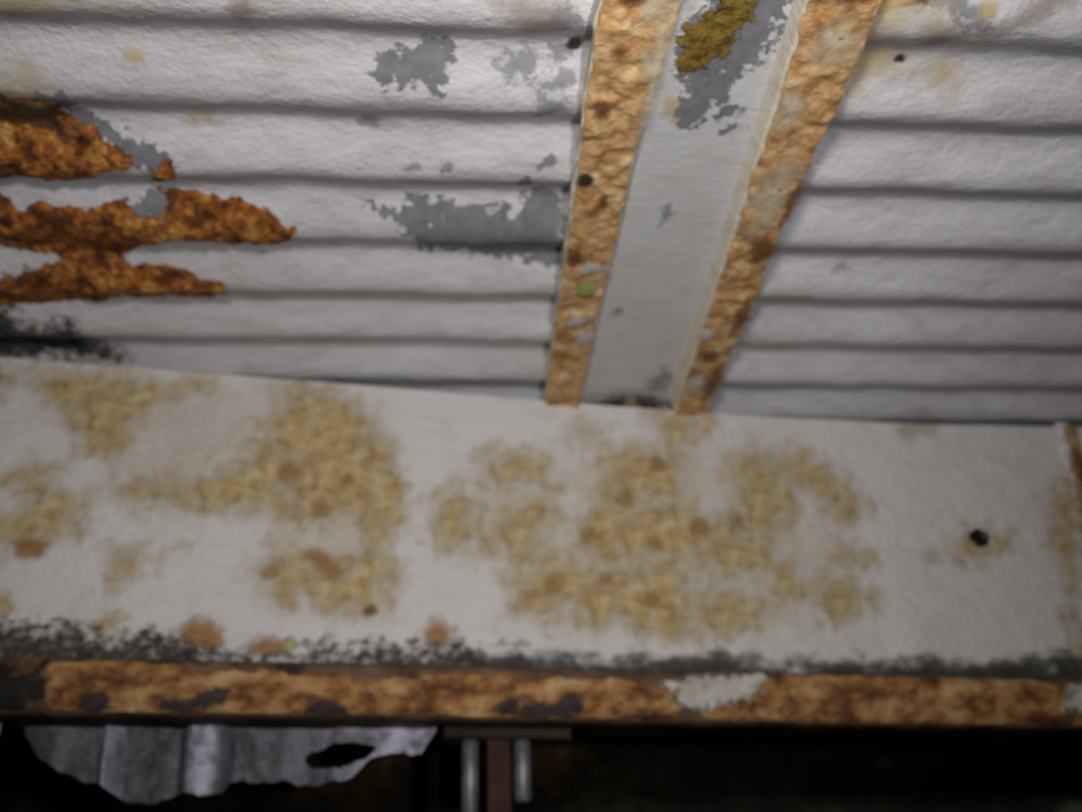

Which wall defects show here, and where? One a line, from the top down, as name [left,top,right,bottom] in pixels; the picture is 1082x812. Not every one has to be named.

peeling [368,36,458,98]
peeling [495,47,536,78]
peeling [537,43,576,117]
corrosion [0,90,298,307]
peeling [361,154,568,267]
corrosion [546,0,924,416]
corrosion [1051,425,1082,589]
corrosion [182,618,221,648]
leakage [0,617,1082,680]
corrosion [12,660,679,719]
peeling [665,672,767,716]
corrosion [704,674,1082,725]